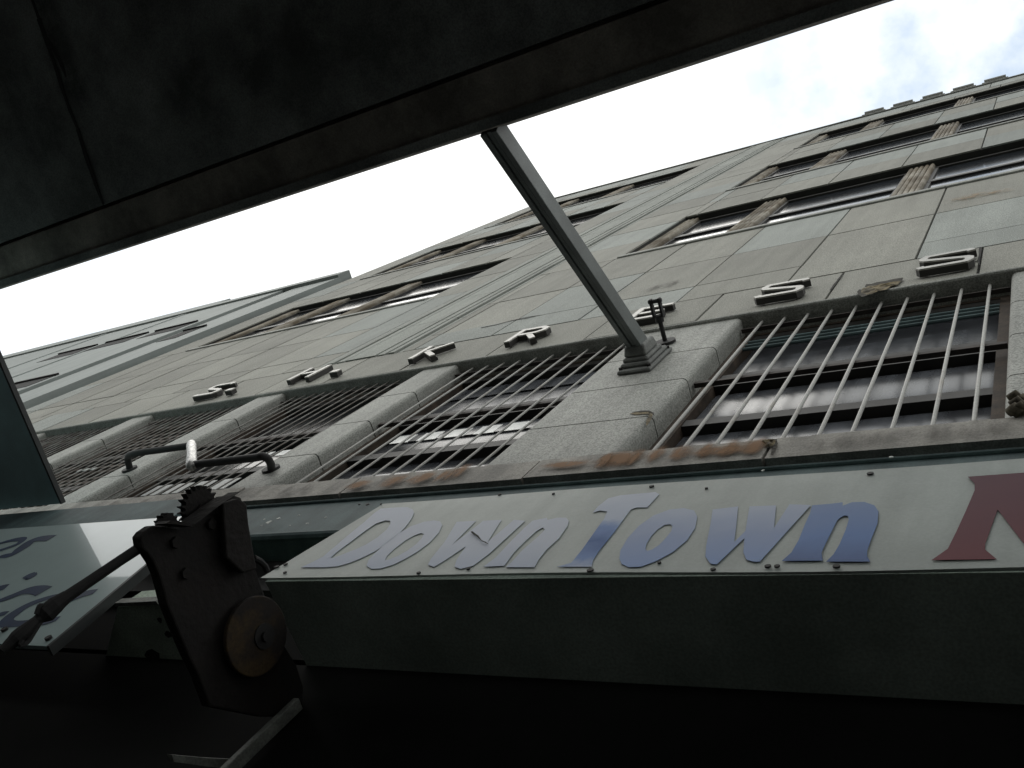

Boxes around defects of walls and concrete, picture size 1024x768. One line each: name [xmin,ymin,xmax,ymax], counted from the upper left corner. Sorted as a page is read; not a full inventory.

corrosion [546,439,764,467]